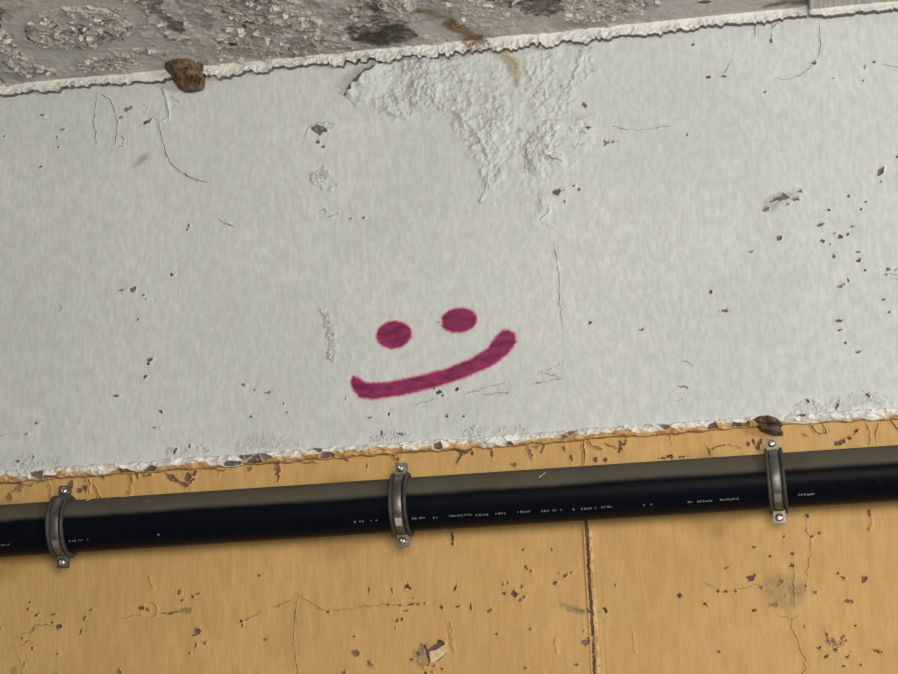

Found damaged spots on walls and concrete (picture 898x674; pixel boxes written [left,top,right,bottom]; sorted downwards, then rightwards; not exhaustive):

corrosion [414,10,491,52]
crack [90,88,127,156]
crack [155,119,212,185]
peeling [0,0,671,231]
crack [797,420,898,447]
crack [774,513,815,674]
crack [9,620,65,650]
crack [236,588,430,674]
spalling [403,636,450,674]